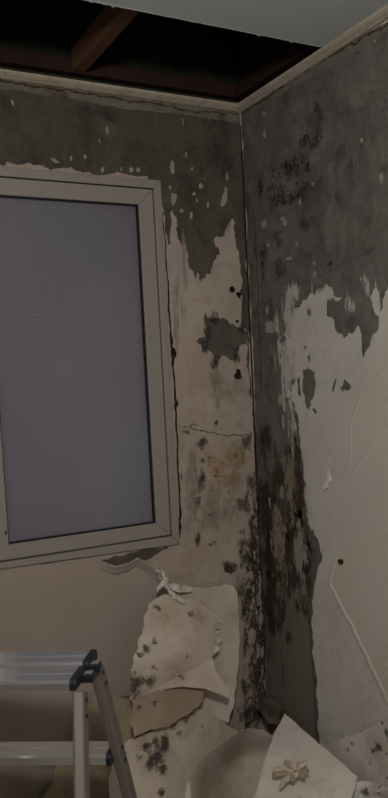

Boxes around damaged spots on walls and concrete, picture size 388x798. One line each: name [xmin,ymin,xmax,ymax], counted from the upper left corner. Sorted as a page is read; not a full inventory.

crack [321,22,388,62]
peeling [0,89,252,397]
crack [0,69,310,693]
peeling [240,31,388,744]
peeling [102,547,168,566]
damp [196,419,316,740]